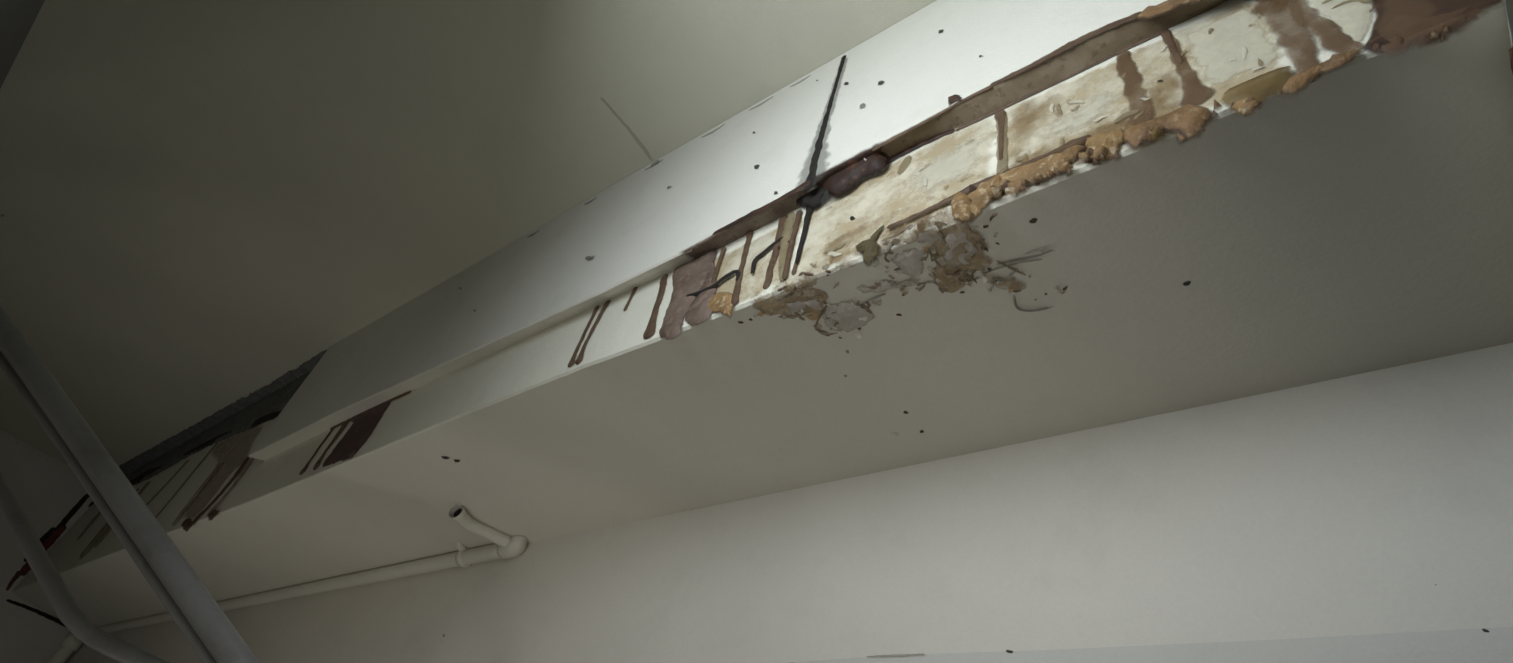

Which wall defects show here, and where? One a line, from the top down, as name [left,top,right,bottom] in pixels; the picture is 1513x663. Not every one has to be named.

crack [686,55,846,297]
corrosion [643,0,1228,340]
corrosion [887,0,1502,229]
corrosion [568,287,638,367]
peeling [738,212,1067,339]
spalling [119,350,327,486]
corrosion [299,391,411,475]